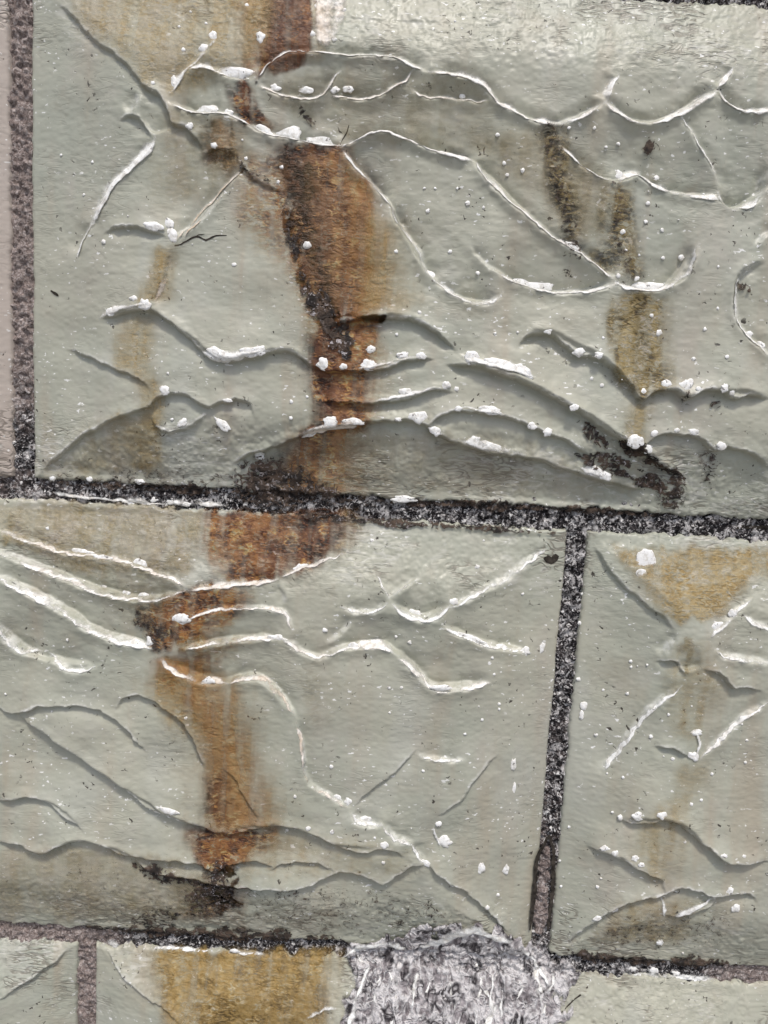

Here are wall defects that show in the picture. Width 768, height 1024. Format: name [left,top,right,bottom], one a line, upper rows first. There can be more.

rust [228,0,312,128]
rust [207,120,235,171]
crack [175,234,227,246]
rust [259,143,388,494]
water stain [0,421,687,713]
rust [138,508,344,915]
crack [529,835,556,931]
rust [156,946,326,1024]